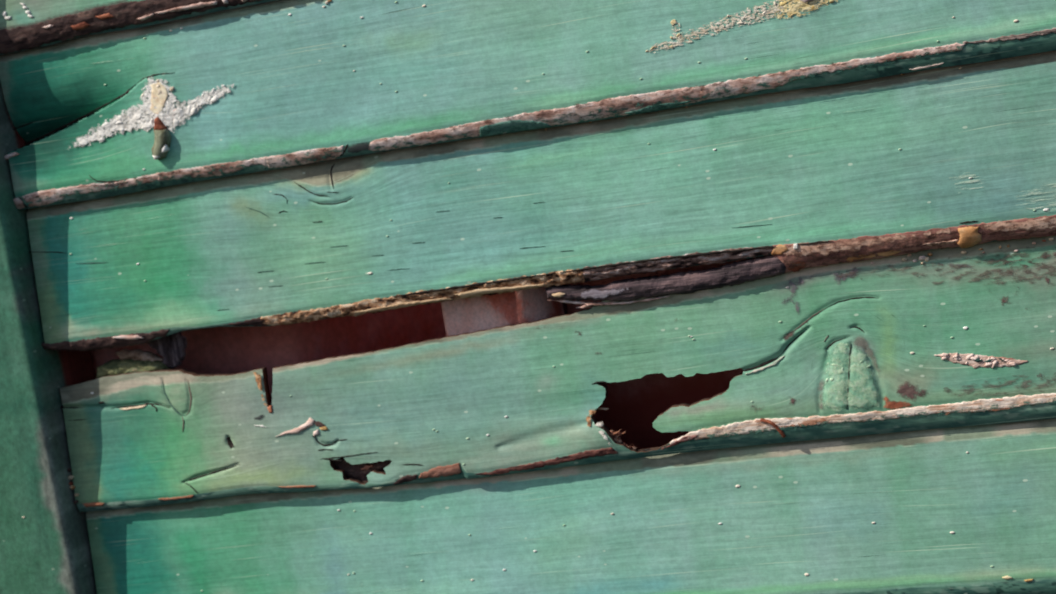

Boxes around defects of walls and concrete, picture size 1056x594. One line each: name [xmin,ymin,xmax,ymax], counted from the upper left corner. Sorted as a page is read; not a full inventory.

peeling [646,0,838,53]
peeling [13,28,1056,209]
leakage [932,247,1056,284]
crack [742,297,875,374]
peeling [934,353,1028,369]
crack [163,382,192,431]
peeling [662,393,1056,450]
spalling [322,457,461,485]